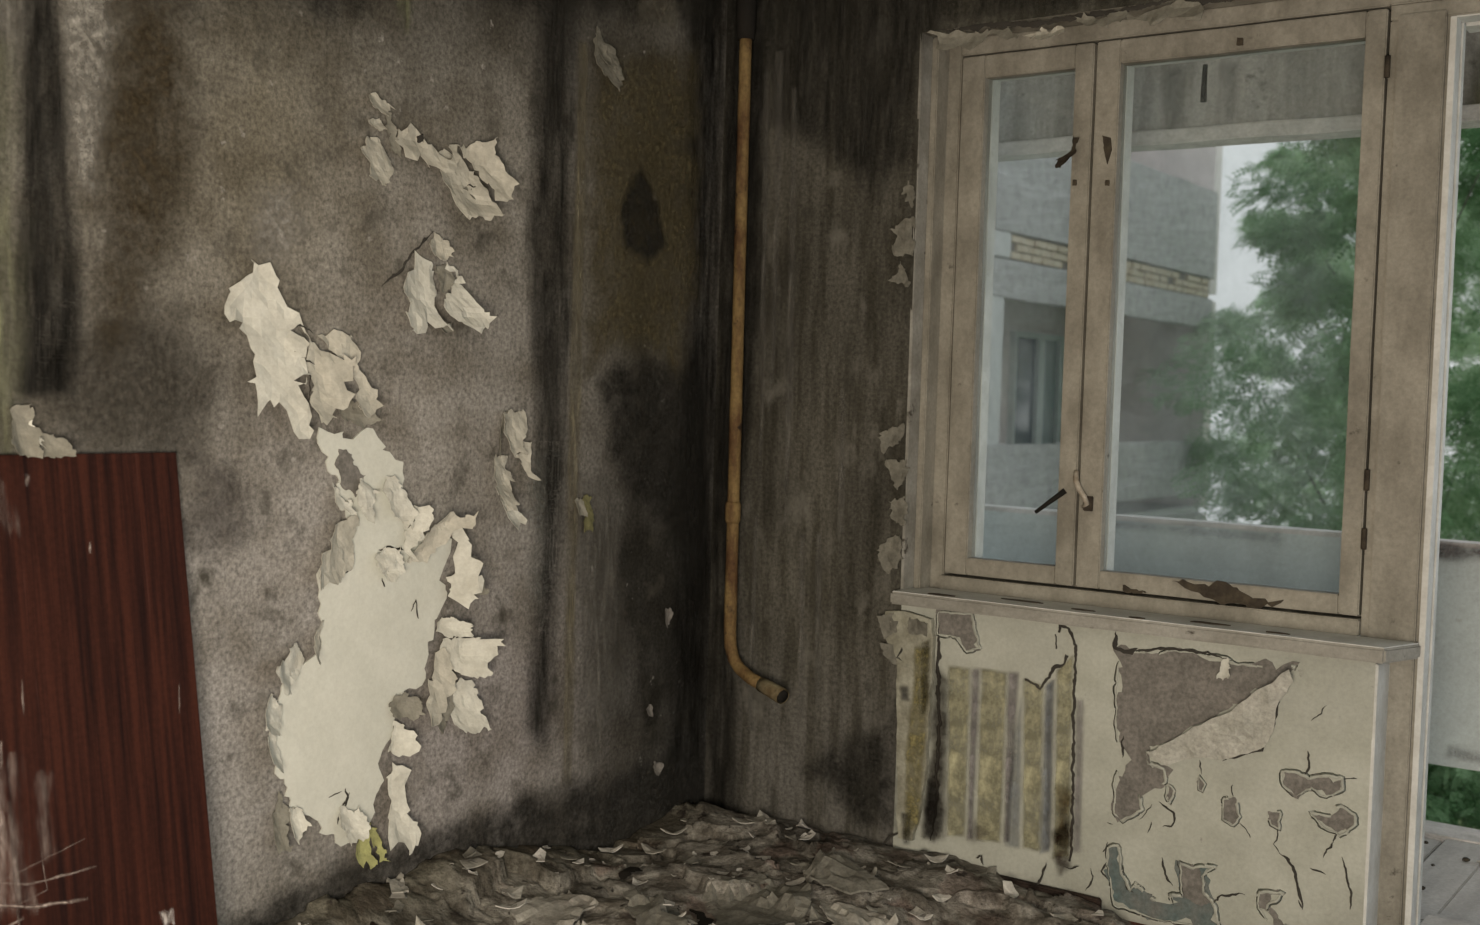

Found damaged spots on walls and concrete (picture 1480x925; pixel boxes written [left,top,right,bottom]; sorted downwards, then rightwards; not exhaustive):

peeling [361,92,519,221]
damp [0,0,205,447]
peeling [382,232,497,334]
peeling [10,404,77,459]
peeling [493,409,542,530]
damp [239,0,938,925]
peeling [224,259,505,869]
flaking render [877,593,982,842]
spalling [1111,632,1300,824]
spalling [1221,785,1250,836]
spalling [1268,752,1359,857]
spalling [1104,842,1221,925]